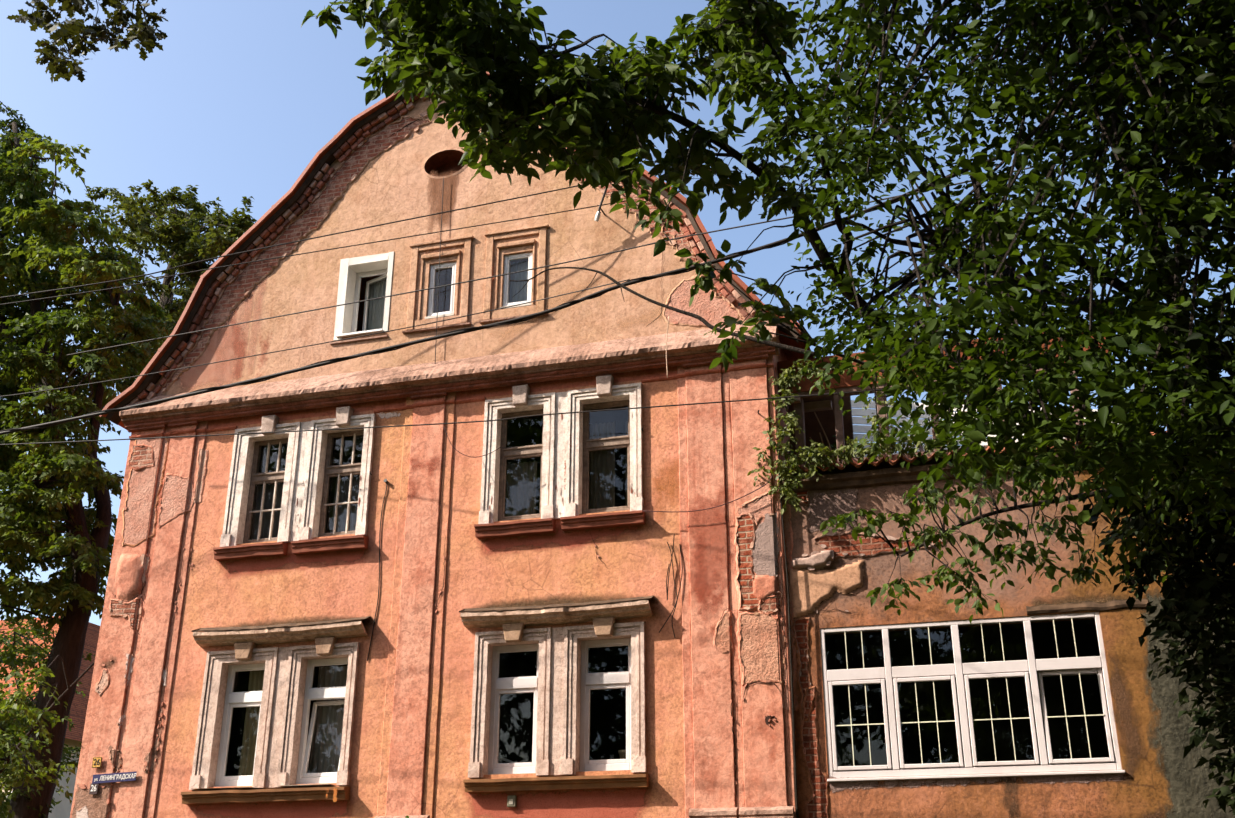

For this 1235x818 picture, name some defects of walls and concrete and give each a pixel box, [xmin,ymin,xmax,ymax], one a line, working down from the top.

spalling [154,101,446,397]
leakage [431,174,455,225]
peeling [109,431,209,630]
flaking render [713,488,946,818]